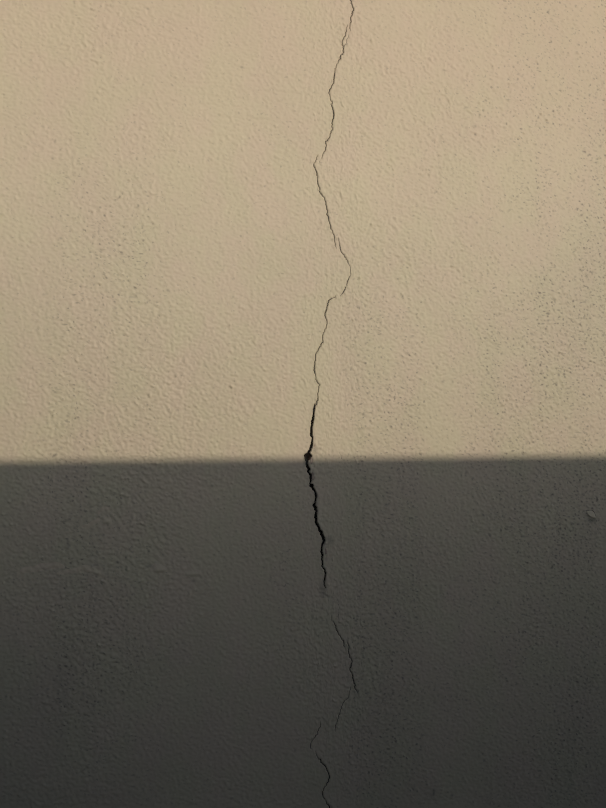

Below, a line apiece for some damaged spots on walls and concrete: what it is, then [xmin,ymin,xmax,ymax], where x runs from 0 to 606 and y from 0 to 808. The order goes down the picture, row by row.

crack [304,0,357,808]